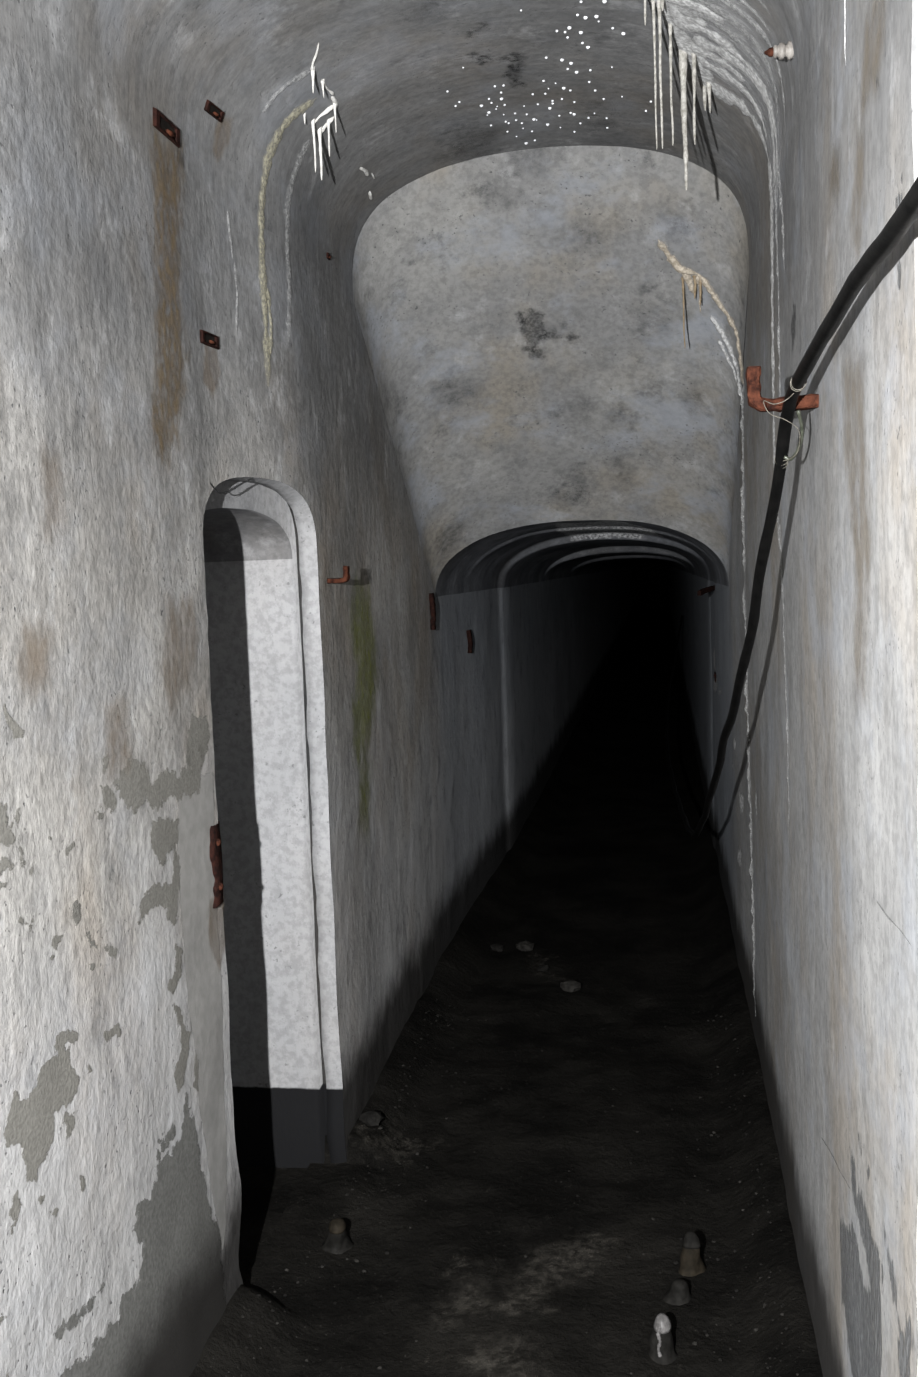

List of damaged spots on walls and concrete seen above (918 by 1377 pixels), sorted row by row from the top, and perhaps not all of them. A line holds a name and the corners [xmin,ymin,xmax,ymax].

leakage [259,43,338,370]
leakage [667,0,784,468]
leakage [658,240,744,556]
flaking render [3,704,25,738]
flaking render [0,802,33,888]
flaking render [50,894,117,971]
flaking render [94,713,210,926]
flaking render [3,1028,92,1235]
flaking render [53,943,226,1377]
flaking render [840,1157,913,1377]